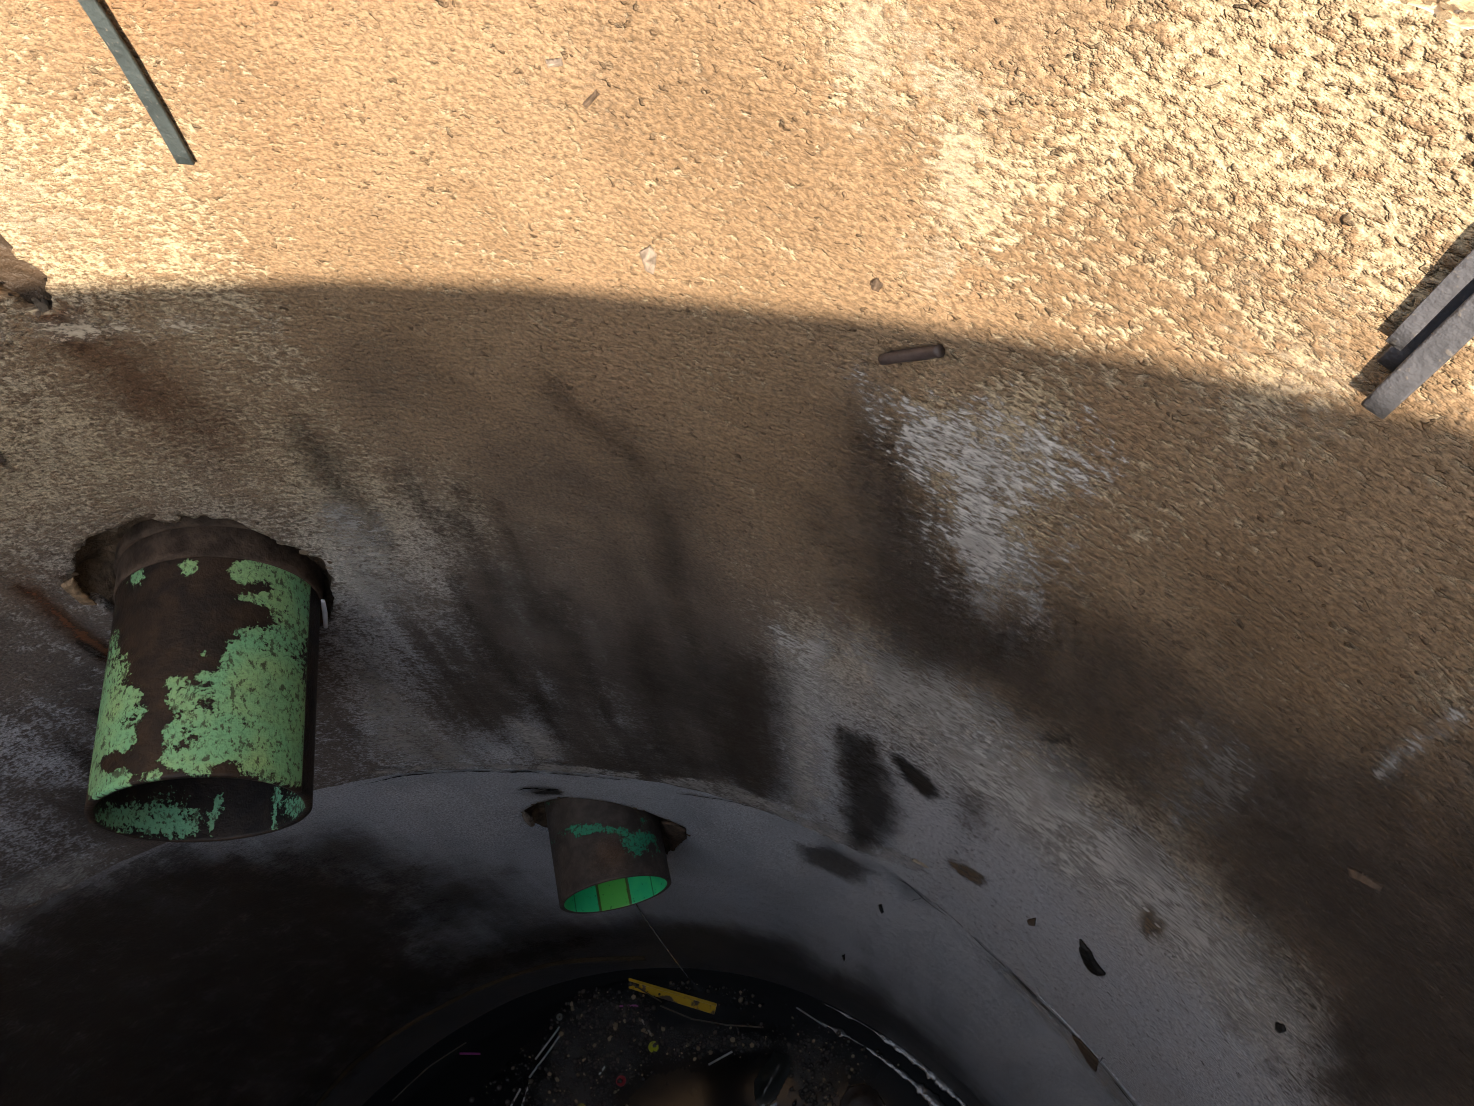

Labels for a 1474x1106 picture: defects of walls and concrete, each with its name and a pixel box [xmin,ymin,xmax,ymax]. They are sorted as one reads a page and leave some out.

spalling [0,233,52,318]
corrosion [14,584,109,663]
leakage [362,371,1346,1077]